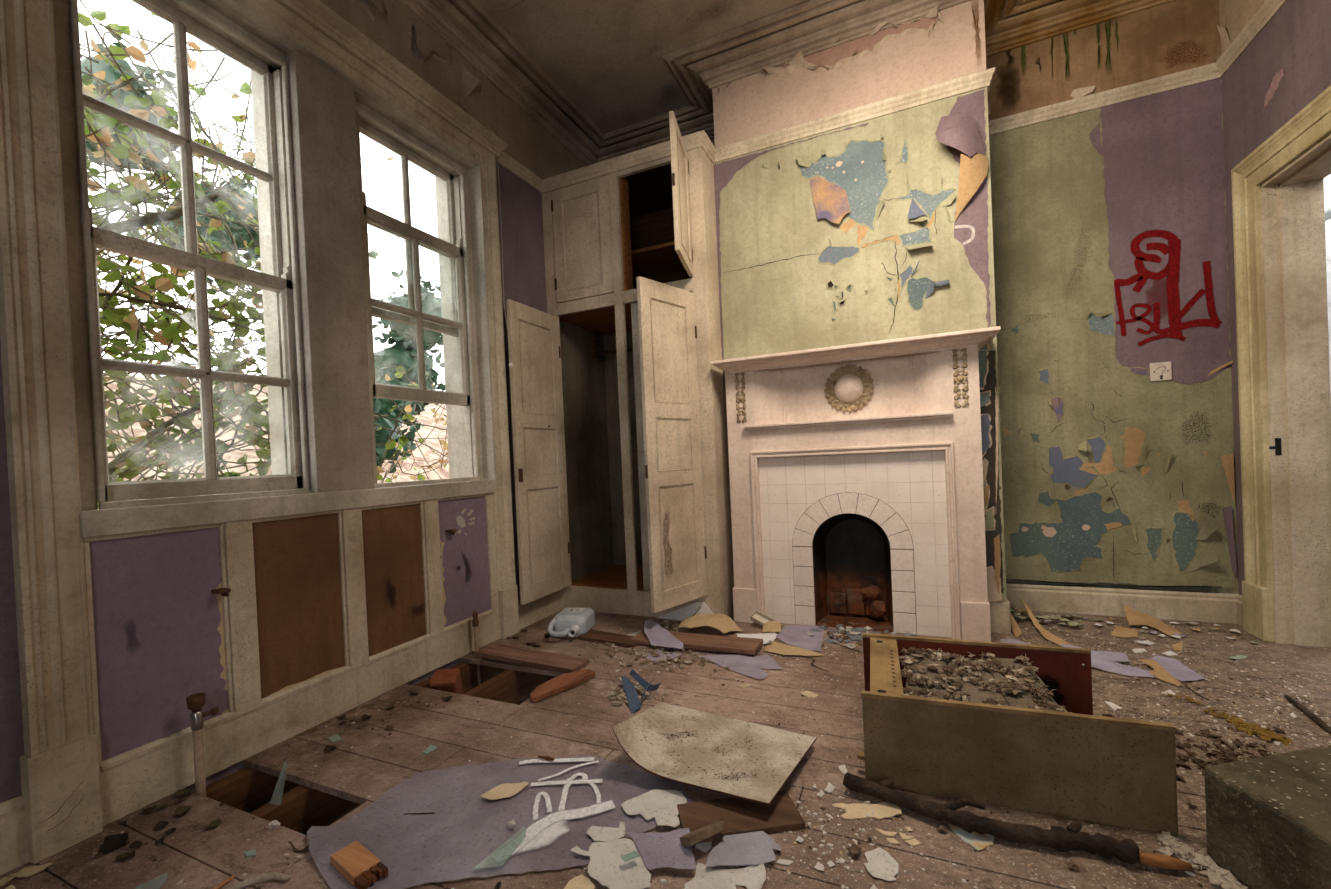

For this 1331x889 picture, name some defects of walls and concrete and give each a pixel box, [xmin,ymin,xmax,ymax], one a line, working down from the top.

peeling [757,5,945,81]
leakage [998,30,1076,105]
peeling [984,0,1176,57]
peeling [1070,86,1095,98]
leakage [1096,20,1119,67]
peeling [761,130,956,322]
peeling [1079,308,1116,338]
peeling [978,344,1218,602]